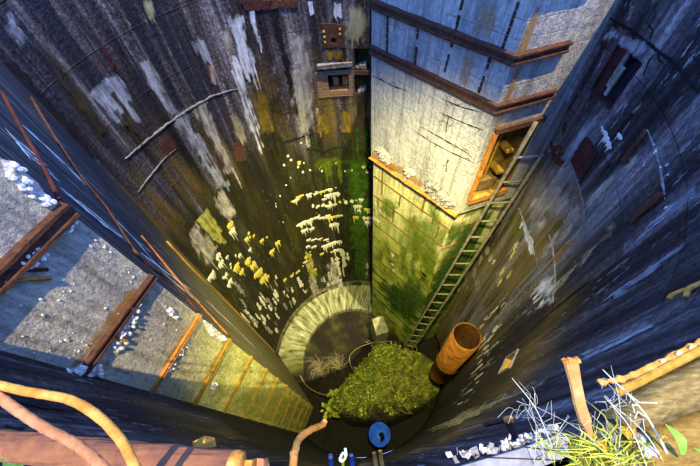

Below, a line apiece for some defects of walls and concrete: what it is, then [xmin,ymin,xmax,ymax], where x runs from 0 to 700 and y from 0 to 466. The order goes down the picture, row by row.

corrosion [518,9,539,52]
leakage [46,51,145,146]
leakage [224,11,319,154]
corrosion [505,67,520,102]
crack [414,98,482,170]
leakage [305,251,321,297]
leakage [327,263,343,288]